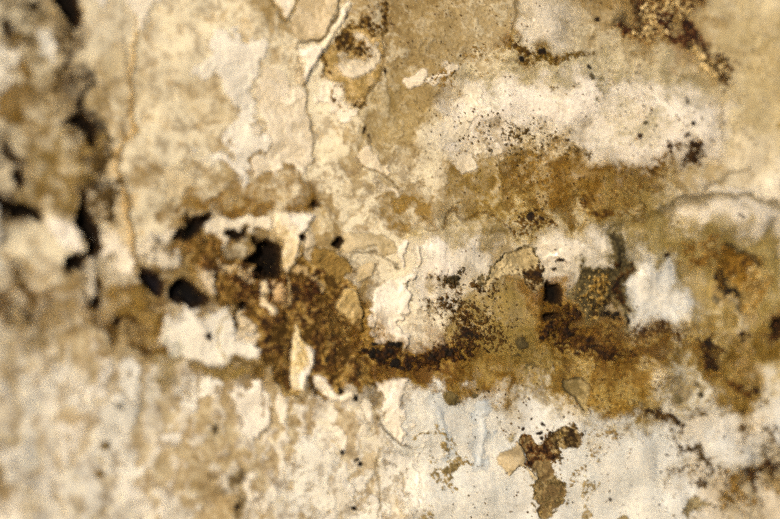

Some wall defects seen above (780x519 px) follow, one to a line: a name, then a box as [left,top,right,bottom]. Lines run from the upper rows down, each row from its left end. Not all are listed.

peeling [125,0,161,30]
peeling [0,42,21,92]
peeling [36,28,57,64]
peeling [191,0,391,187]
leakage [273,164,319,213]
crack [661,172,780,210]
peeling [47,218,82,251]
leakage [378,131,780,487]
spalling [87,215,483,493]